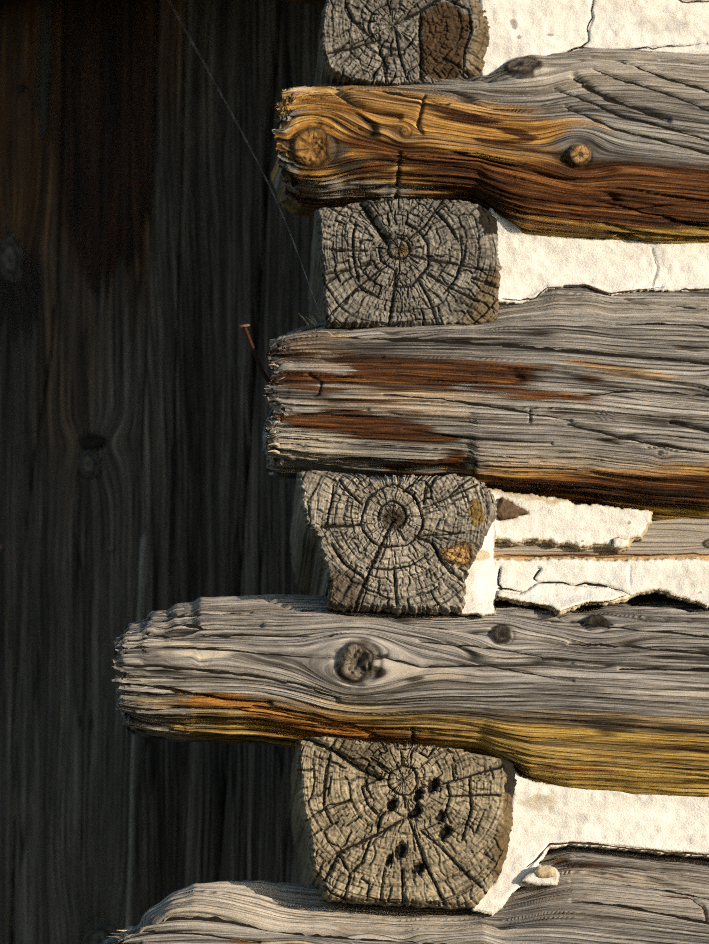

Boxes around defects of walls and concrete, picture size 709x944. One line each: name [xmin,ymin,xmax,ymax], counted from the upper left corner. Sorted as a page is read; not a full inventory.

crack [562,0,594,53]
crack [631,42,703,50]
peeling [494,512,709,561]
crack [493,537,709,612]
peeling [495,583,709,615]
crack [526,842,709,868]